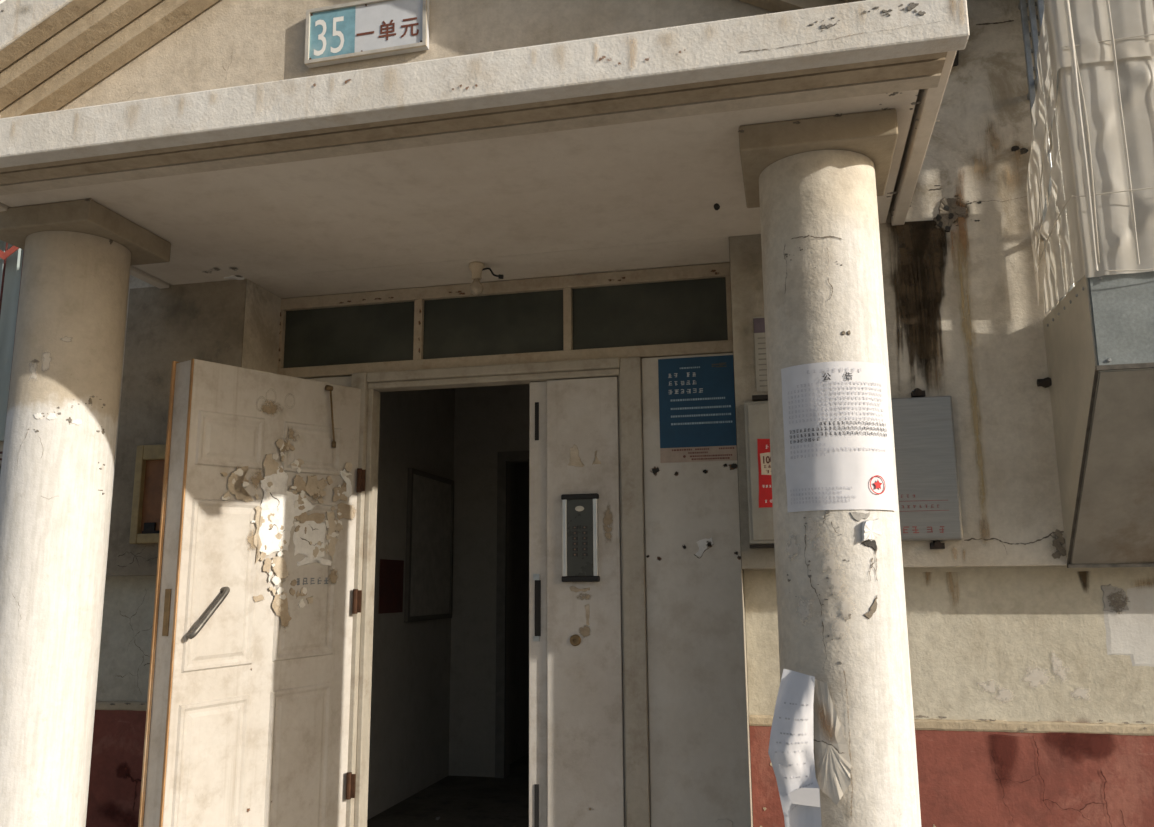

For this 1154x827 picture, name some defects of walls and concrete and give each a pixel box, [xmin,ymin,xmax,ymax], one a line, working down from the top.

peeling [863,2,926,16]
spalling [928,185,982,232]
crack [784,235,842,301]
rust [951,176,972,345]
leakage [890,220,947,382]
peeling [34,395,106,432]
crack [965,531,1064,552]
spalling [1101,584,1129,614]
leakage [991,734,1017,785]
crack [991,737,1126,827]
leakage [1047,732,1114,758]